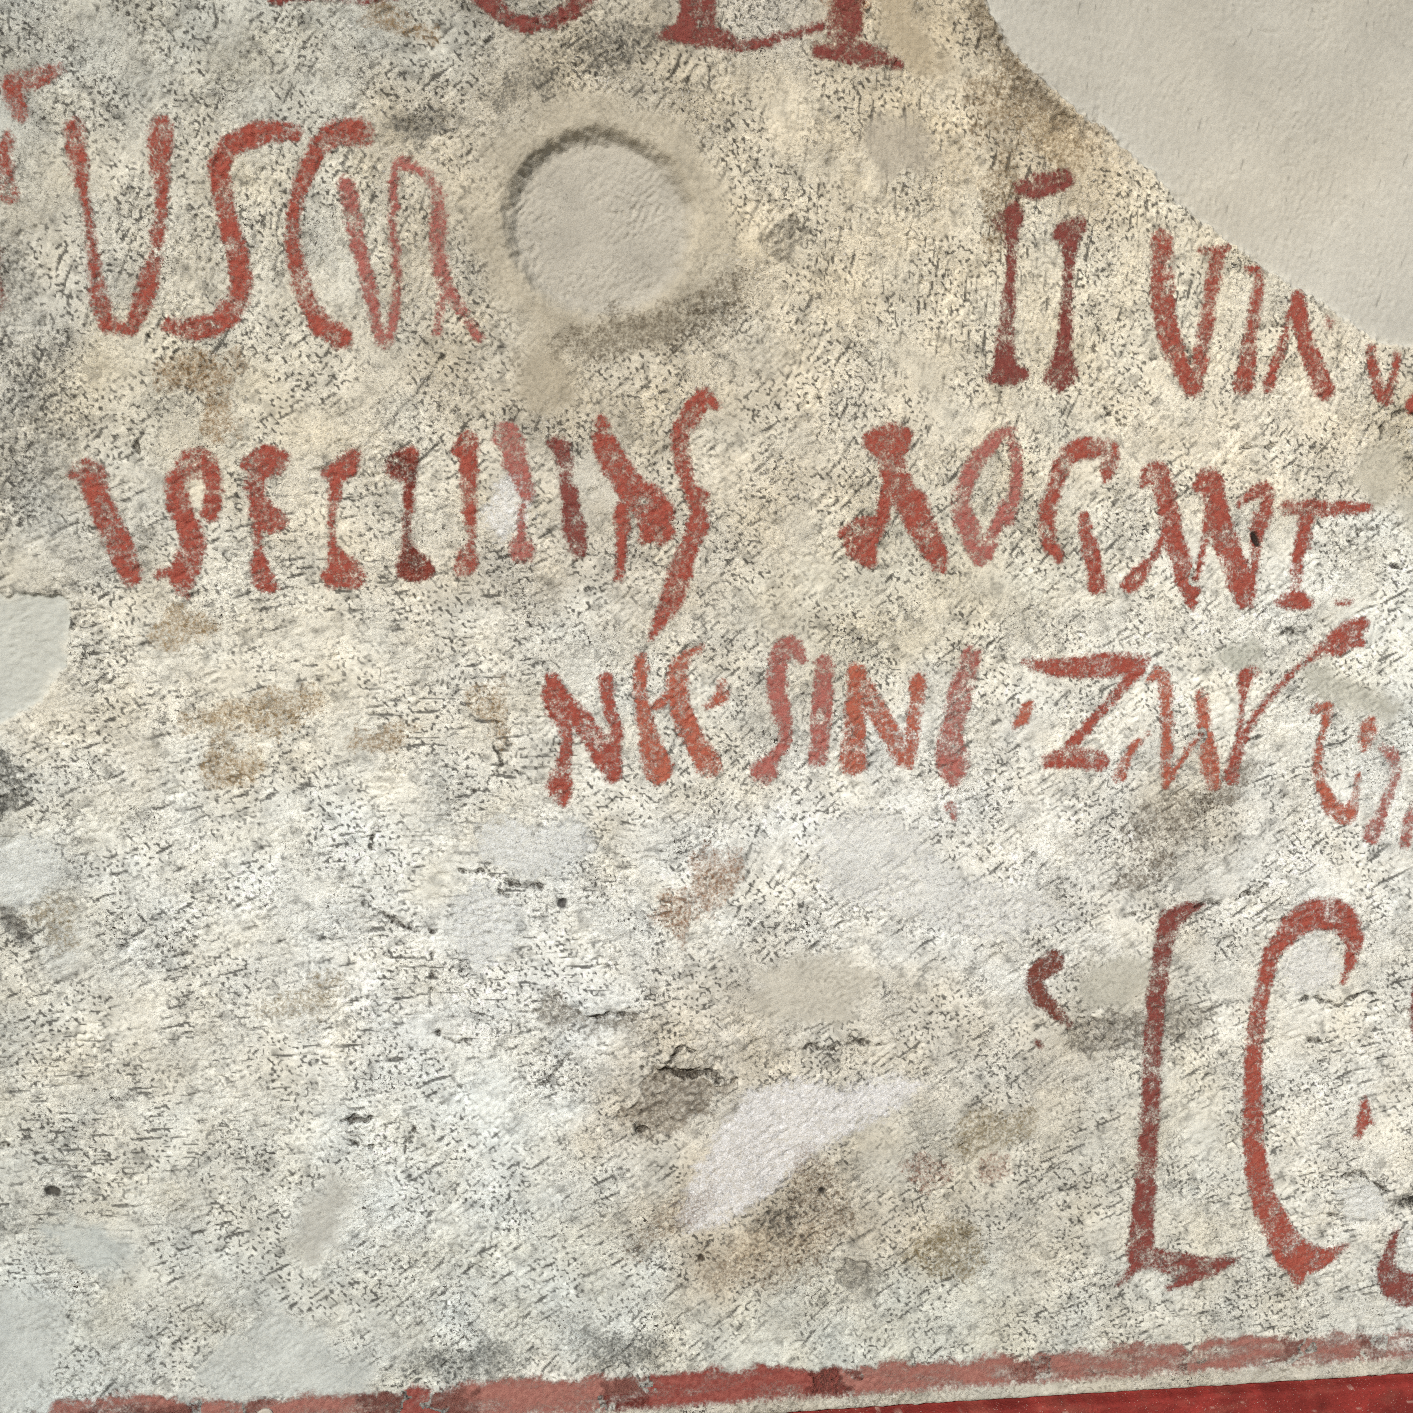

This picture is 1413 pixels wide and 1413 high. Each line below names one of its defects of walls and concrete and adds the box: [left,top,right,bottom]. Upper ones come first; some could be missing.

spalling [0,770,29,814]